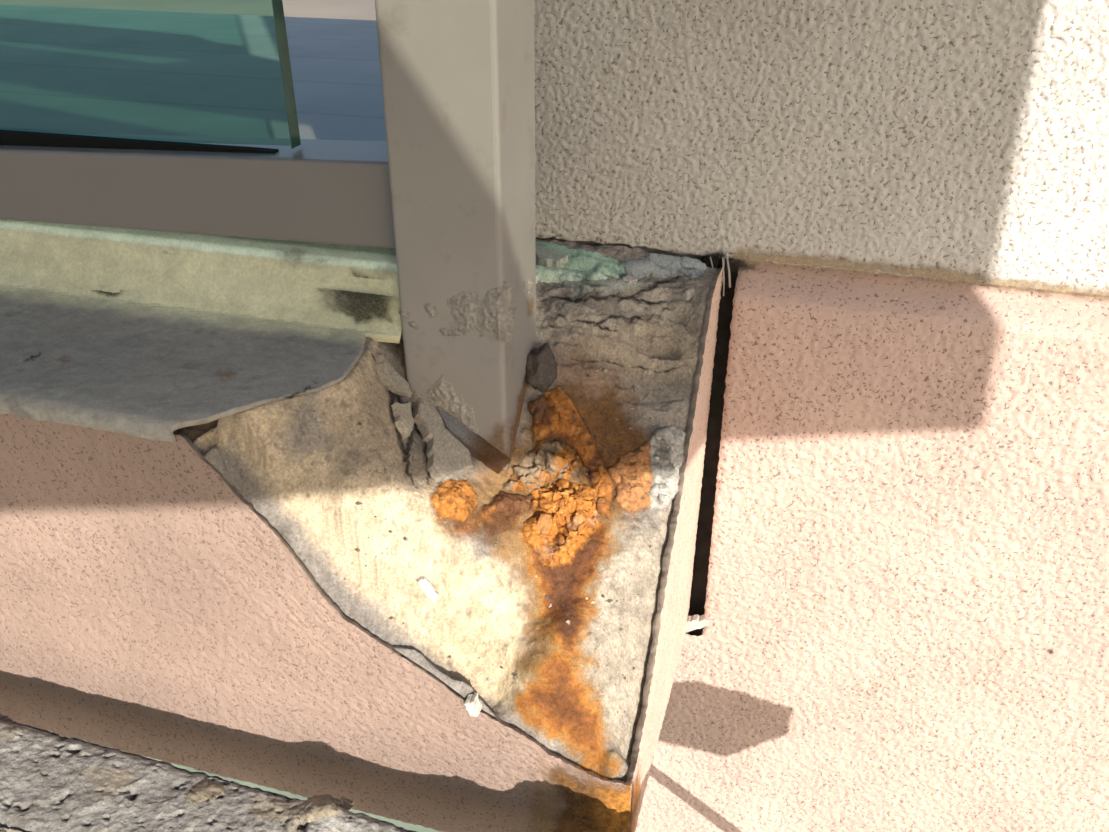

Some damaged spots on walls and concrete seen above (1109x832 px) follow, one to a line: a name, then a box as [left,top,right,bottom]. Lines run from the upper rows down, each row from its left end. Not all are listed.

spalling [299,794,354,829]
crack [389,390,431,483]
spalling [173,239,718,782]
corrosion [451,382,642,832]